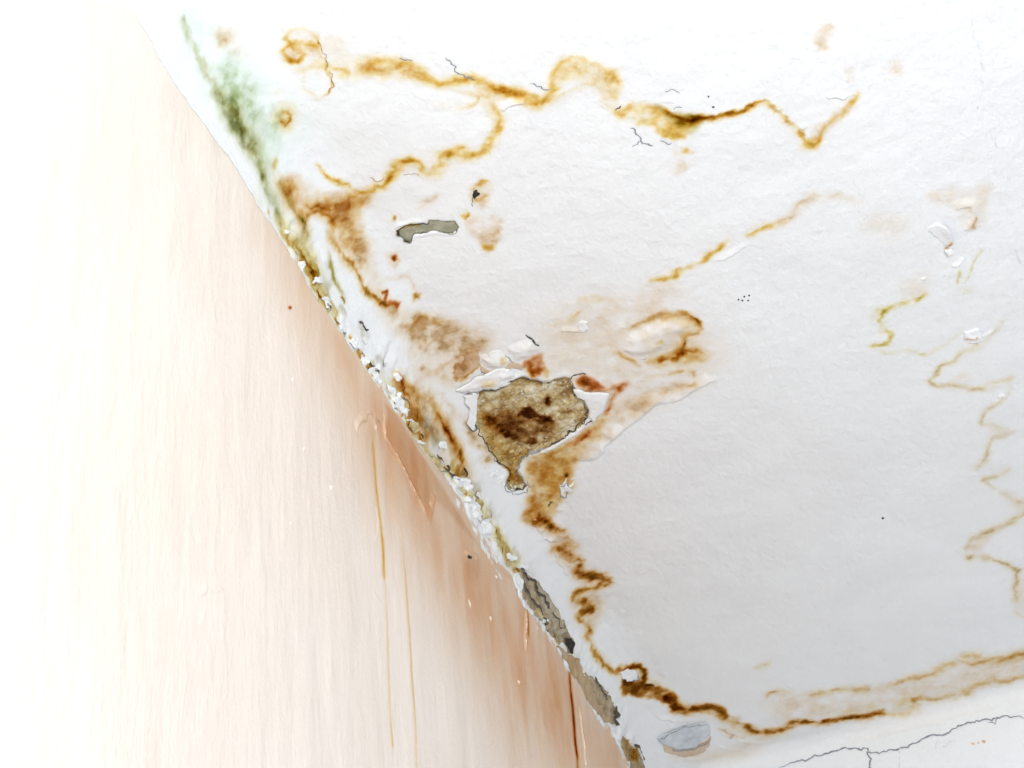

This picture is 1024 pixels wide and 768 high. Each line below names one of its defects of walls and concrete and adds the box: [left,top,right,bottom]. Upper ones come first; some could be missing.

damp [228,115,244,140]
damp [667,101,761,125]
flaking render [391,218,461,244]
spalling [454,349,717,495]
peeling [559,475,575,499]
damp [531,502,558,531]
peeling [533,518,573,576]
damp [557,547,611,633]
damp [594,651,728,719]
flaking render [653,711,763,762]
damp [745,712,881,734]
crack [782,715,1023,768]